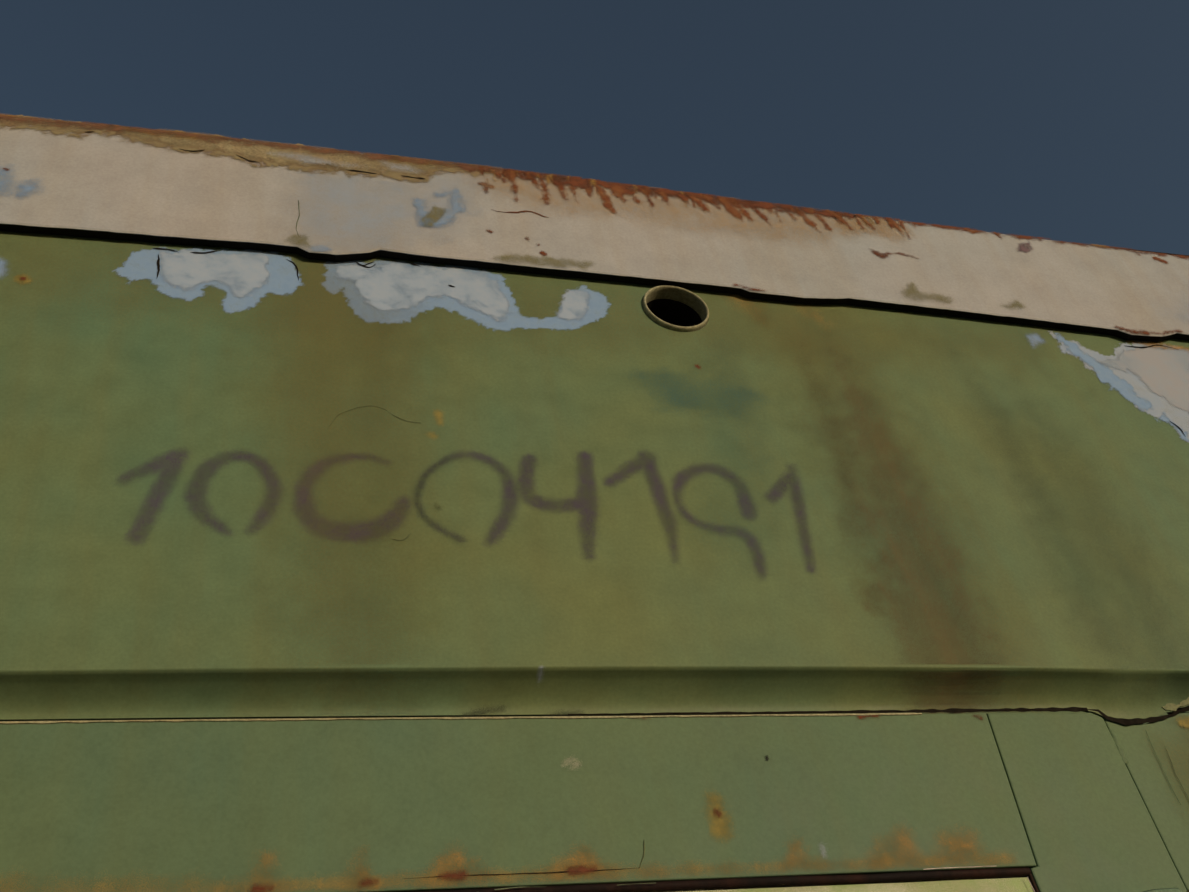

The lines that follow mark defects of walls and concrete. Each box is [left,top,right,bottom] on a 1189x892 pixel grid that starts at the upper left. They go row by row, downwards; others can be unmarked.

rust [0,113,358,155]
rust [372,153,1189,263]
peeling [114,233,611,332]
damp [0,232,1077,386]
peeling [1024,331,1189,442]